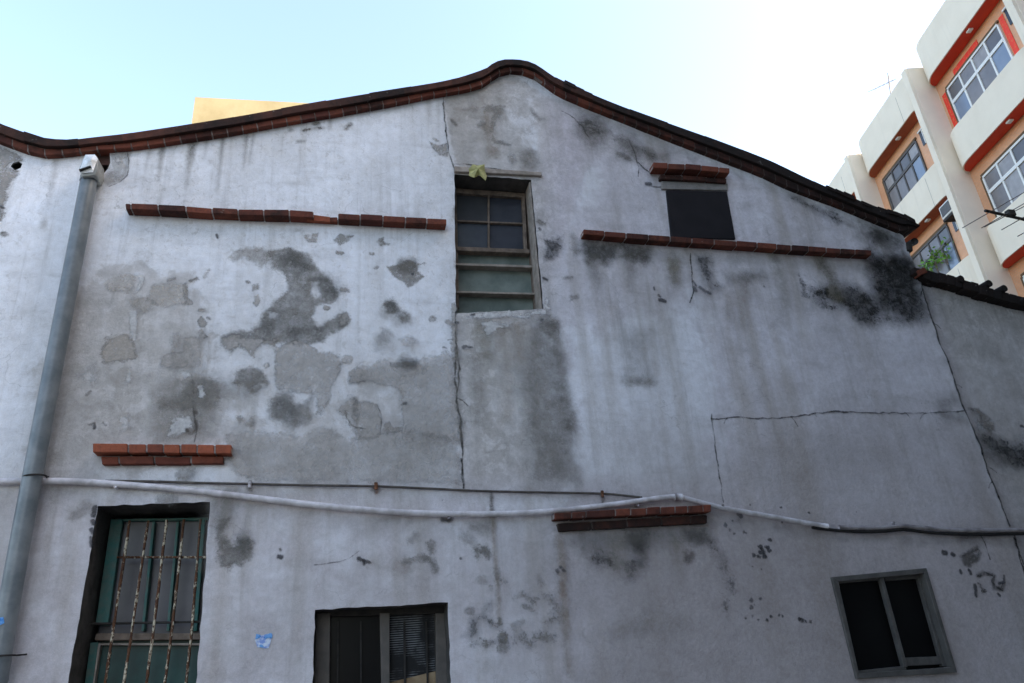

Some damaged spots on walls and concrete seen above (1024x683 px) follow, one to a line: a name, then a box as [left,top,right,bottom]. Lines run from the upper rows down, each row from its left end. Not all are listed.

damp [800,258,924,323]
peeling [222,334,364,412]
peeling [339,399,400,438]
crack [451,312,468,489]
crack [711,282,1024,571]
spalling [752,538,772,570]
peeling [942,548,980,575]